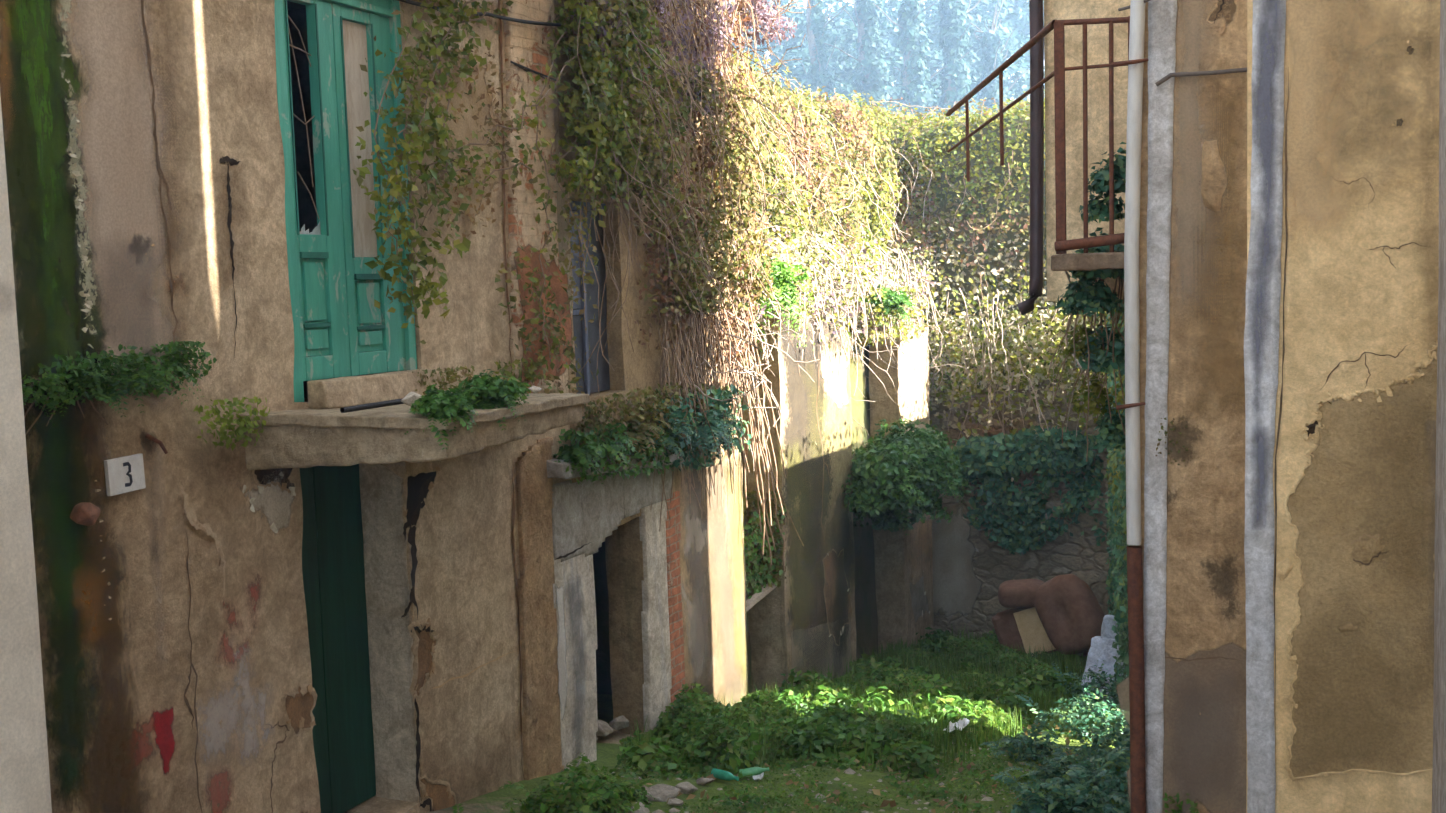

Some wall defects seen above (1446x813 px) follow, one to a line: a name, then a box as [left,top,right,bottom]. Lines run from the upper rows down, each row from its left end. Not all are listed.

flaking render [1205,0,1240,35]
crack [141,0,178,345]
damp [0,0,175,813]
crack [219,156,240,361]
spalling [507,244,575,382]
crack [1322,343,1414,388]
flaking render [242,468,297,533]
crack [401,473,434,633]
flaking render [1282,336,1438,782]
flaking render [281,682,317,739]
crack [415,699,434,812]